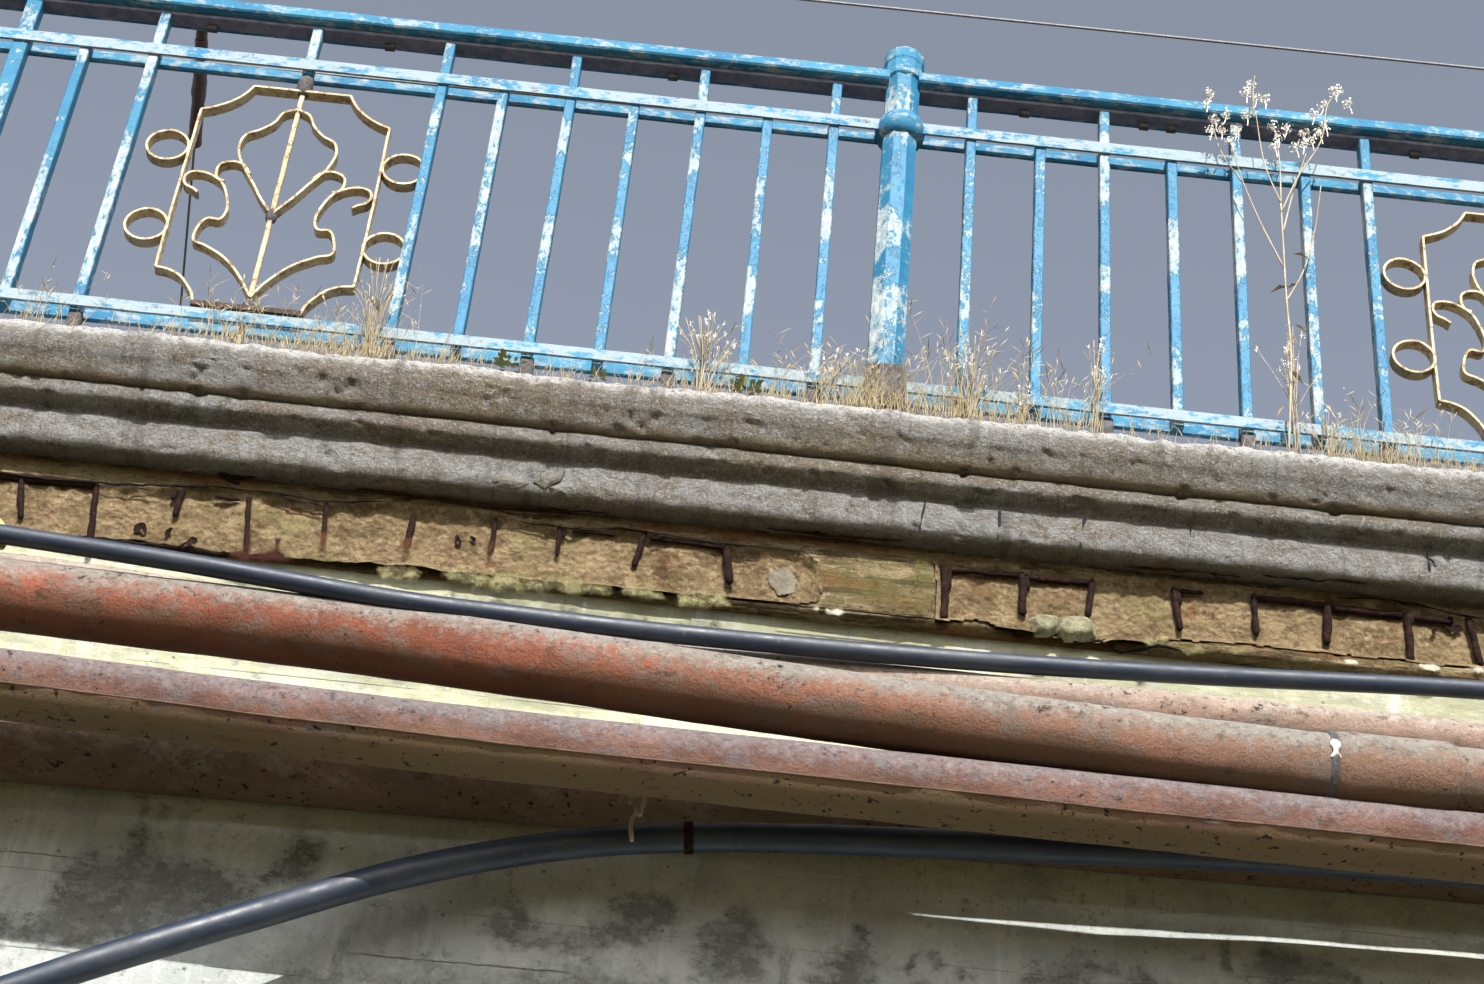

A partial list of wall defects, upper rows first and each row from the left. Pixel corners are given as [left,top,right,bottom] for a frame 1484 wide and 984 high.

corrosion [230,525,290,561]
spalling [0,469,824,604]
spalling [933,557,1484,669]
crack [1129,528,1484,619]
leakage [0,828,320,949]
leakage [483,893,676,954]
leakage [695,910,792,984]
leakage [807,925,874,984]